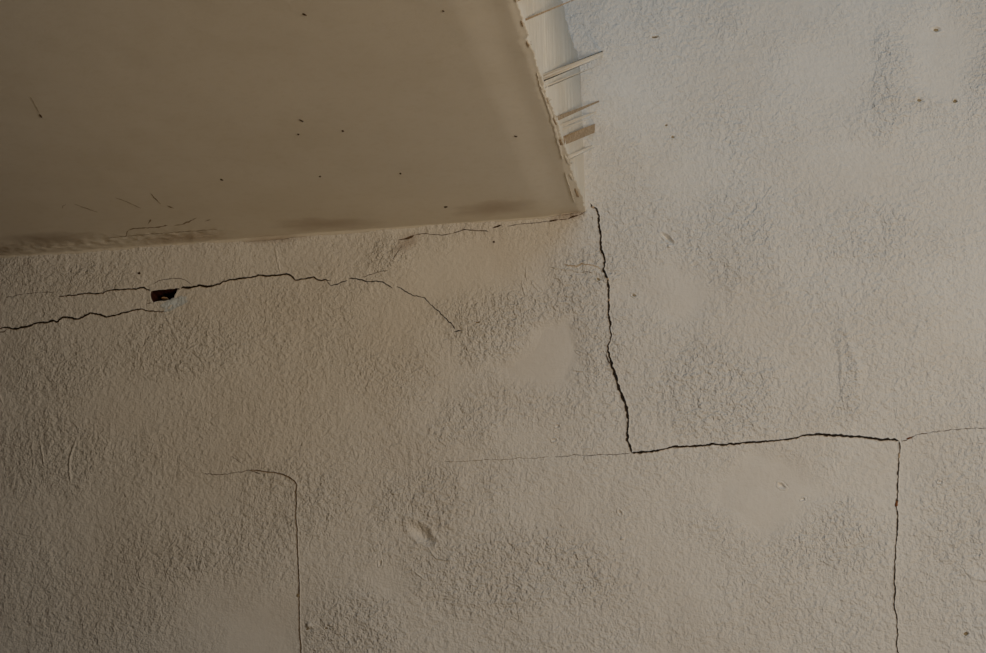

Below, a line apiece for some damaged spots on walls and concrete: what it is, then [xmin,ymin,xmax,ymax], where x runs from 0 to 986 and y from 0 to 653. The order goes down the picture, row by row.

spalling [148,287,187,312]
crack [0,203,984,653]